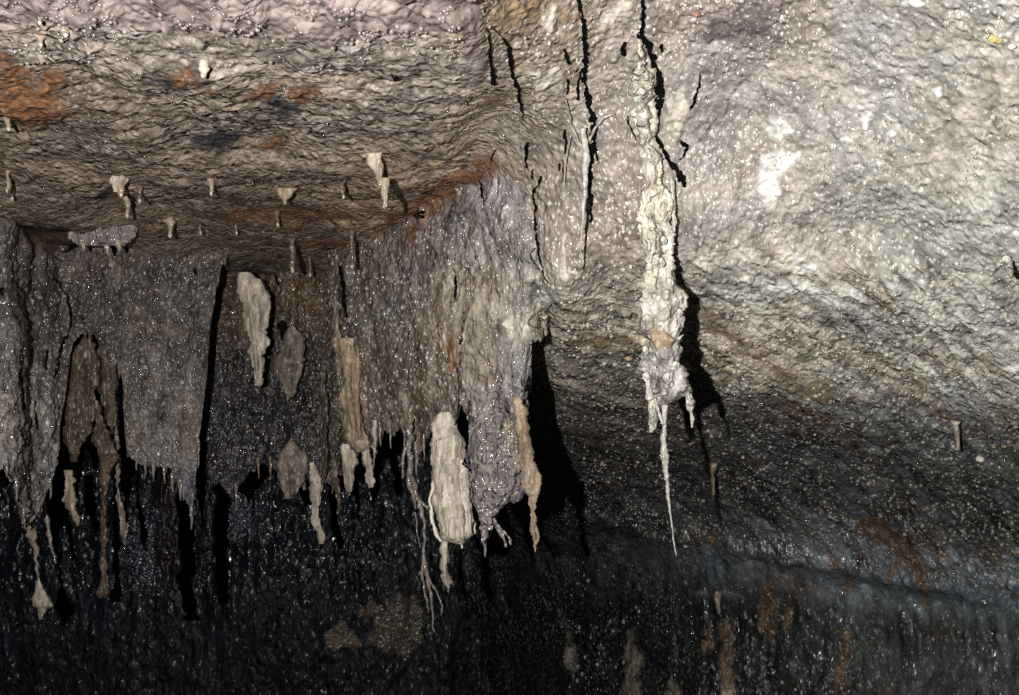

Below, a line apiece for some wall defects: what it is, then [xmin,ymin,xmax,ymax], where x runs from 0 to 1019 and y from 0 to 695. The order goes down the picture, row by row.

efflorescence [541,5,558,34]
efflorescence [598,0,633,36]
rust [0,53,69,128]
crack [486,26,524,118]
efflorescence [524,67,565,97]
crack [524,0,598,284]
crack [620,0,689,188]
efflorescence [634,68,691,152]
crack [689,74,700,112]
rust [361,153,498,246]
efflorescence [442,277,488,371]
damp [107,490,162,598]